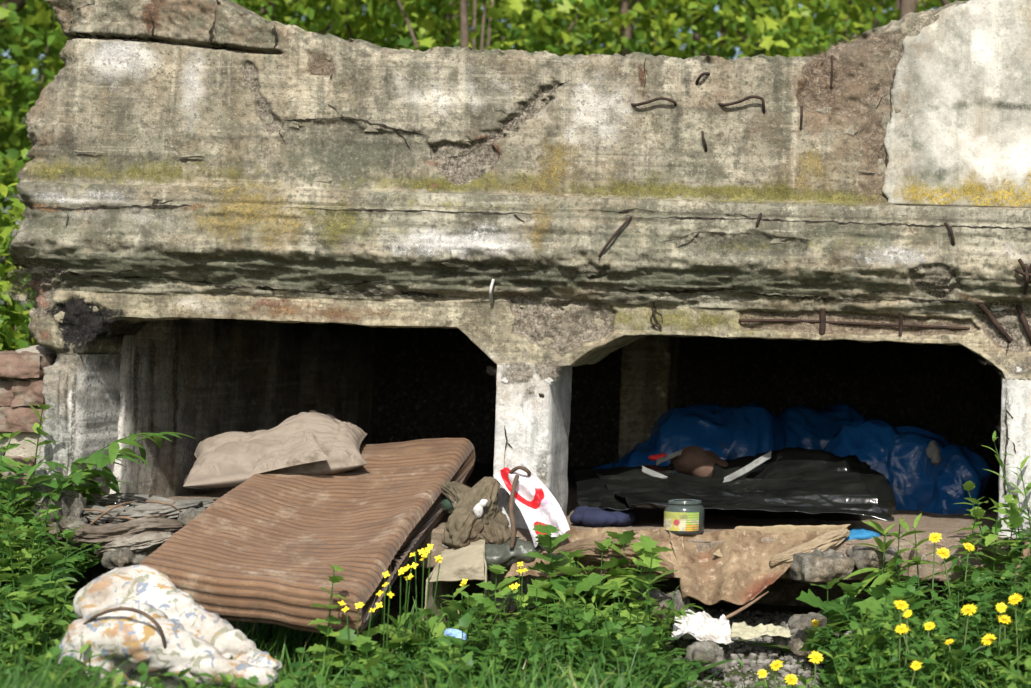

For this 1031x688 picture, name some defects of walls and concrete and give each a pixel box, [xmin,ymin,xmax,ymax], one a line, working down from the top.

crack [279,104,432,151]
spalling [242,62,560,187]
crack [448,79,572,158]
peeling [799,31,904,206]
water stain [208,185,303,240]
spalling [4,258,104,347]